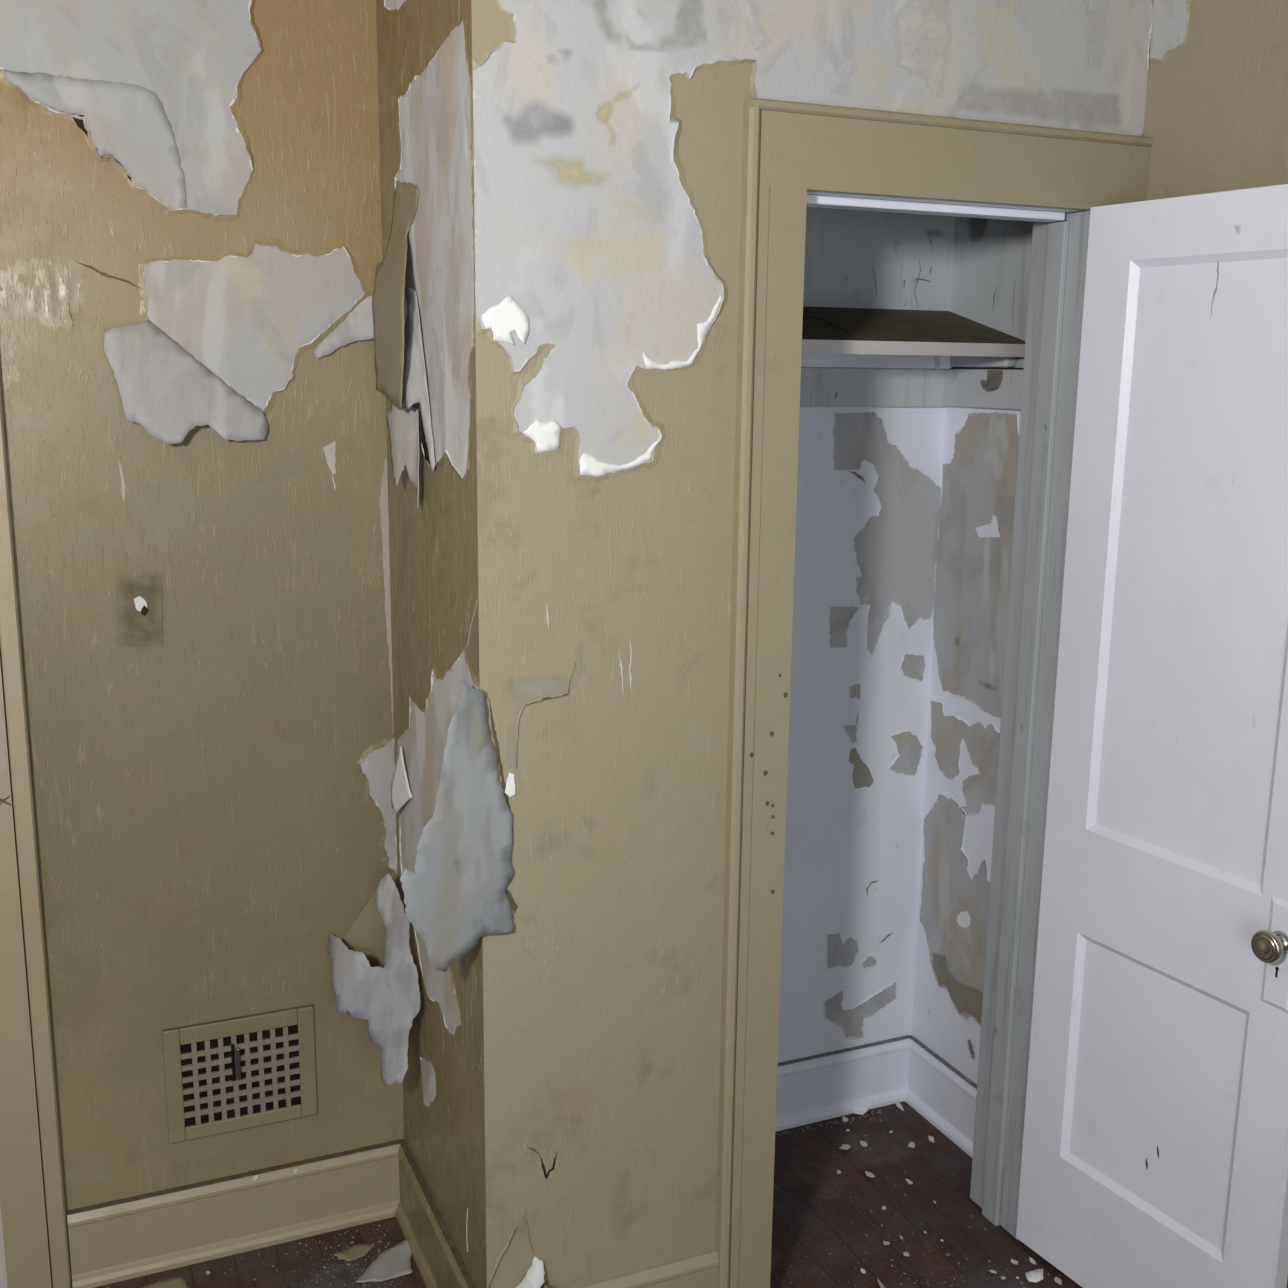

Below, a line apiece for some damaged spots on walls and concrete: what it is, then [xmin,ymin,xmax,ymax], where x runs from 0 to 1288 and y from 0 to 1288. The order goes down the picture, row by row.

peeling [0,0,265,222]
peeling [104,0,1194,508]
peeling [356,648,479,880]
peeling [825,409,1020,1028]
peeling [420,1054,438,1112]
peeling [414,930,462,1038]
peeling [823,980,898,1039]